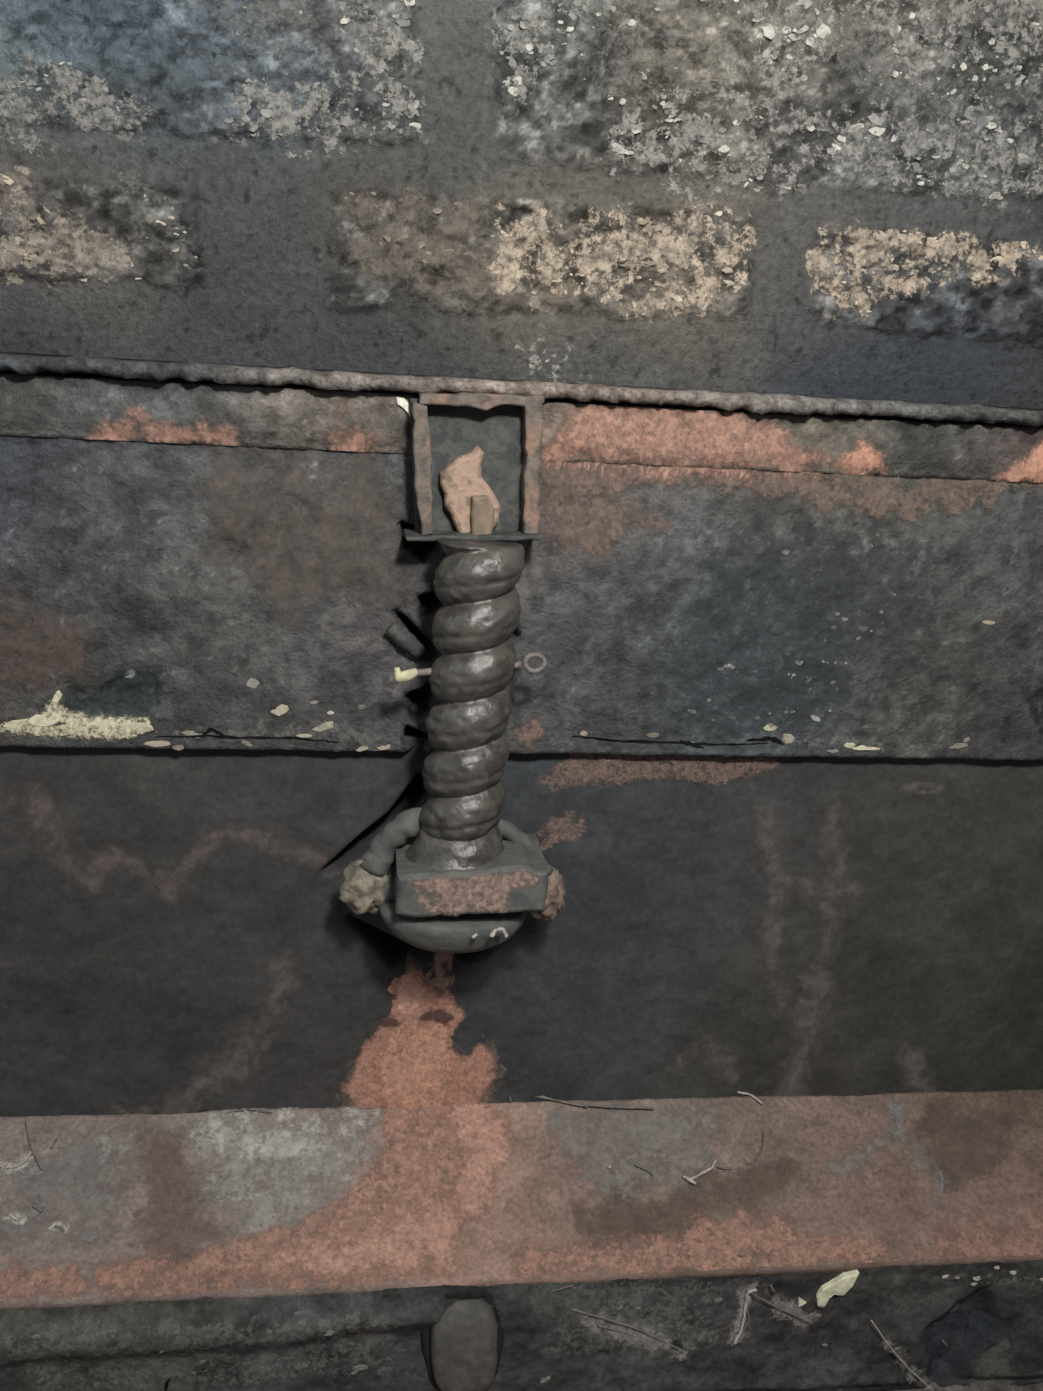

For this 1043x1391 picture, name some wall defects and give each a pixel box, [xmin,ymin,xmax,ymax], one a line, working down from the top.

rust [87,407,237,446]
rust [328,395,373,452]
rust [540,405,1043,558]
peeling [0,690,202,751]
peeling [271,704,289,716]
peeling [296,701,334,738]
crack [573,736,784,748]
rust [0,956,511,1301]
rust [510,1206,897,1279]
rust [910,1209,1043,1260]